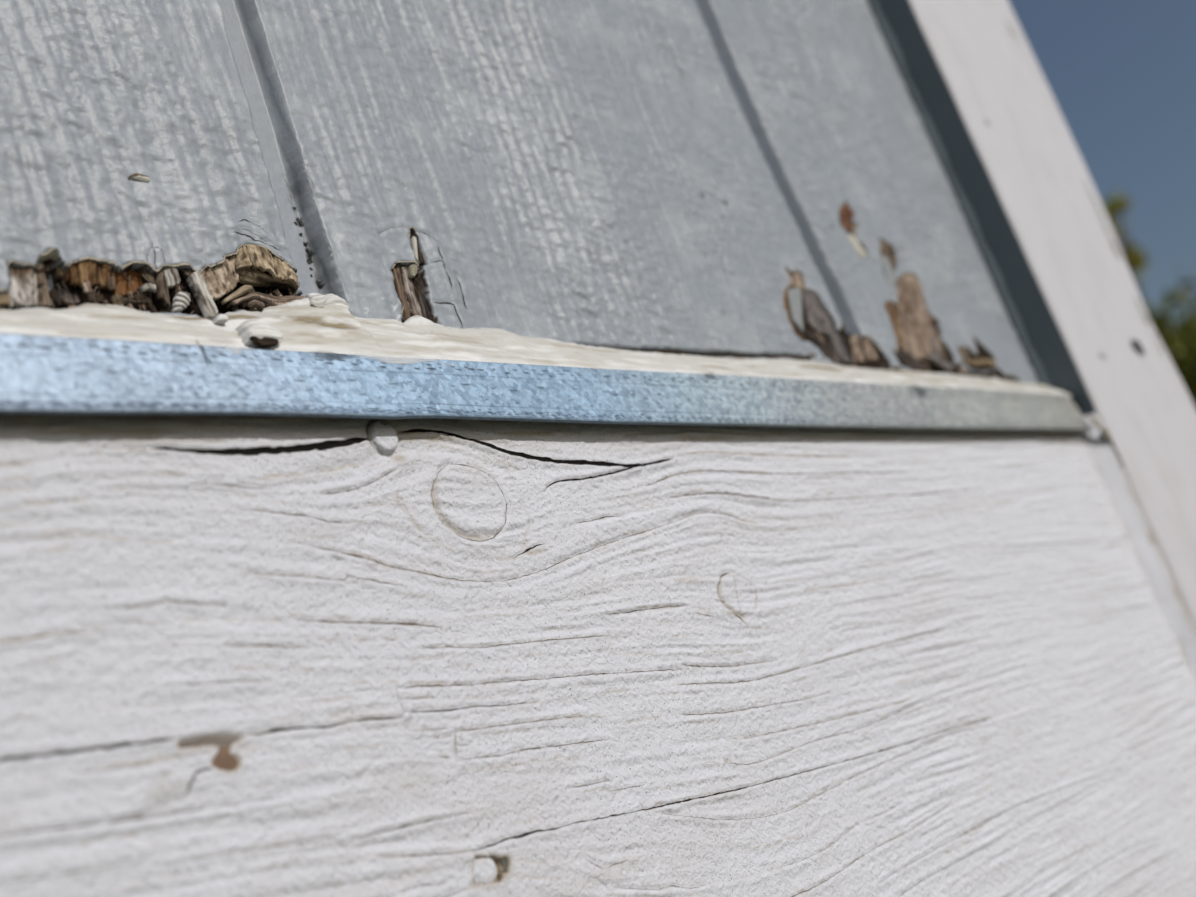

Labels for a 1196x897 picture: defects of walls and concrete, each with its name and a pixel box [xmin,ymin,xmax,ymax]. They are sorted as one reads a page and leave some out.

peeling [36,251,59,262]
peeling [407,236,418,278]
peeling [839,200,911,287]
peeling [787,288,804,334]
crack [154,437,368,455]
crack [192,429,982,586]
crack [229,619,592,648]
crack [0,737,181,763]
peeling [179,736,240,795]
crack [175,629,989,897]
crack [782,768,1122,897]